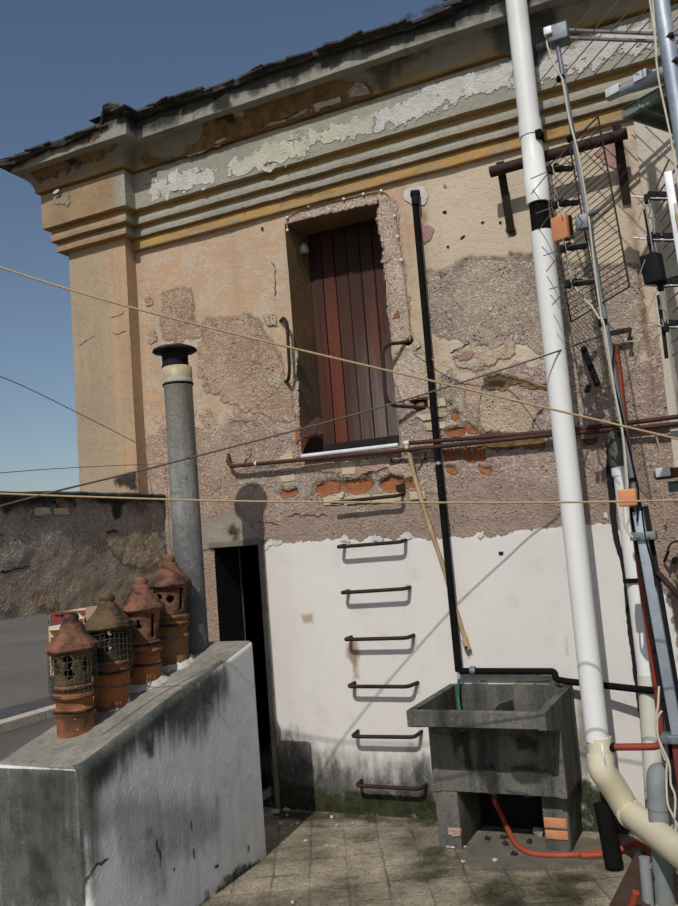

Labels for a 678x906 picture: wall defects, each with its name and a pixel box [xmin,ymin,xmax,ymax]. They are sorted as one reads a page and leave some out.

peeling [148,60,515,203]
spalling [144,193,547,501]
spalling [556,256,647,391]
peeling [263,539,282,571]
water stain [24,675,222,898]
water stain [270,737,437,820]
water stain [432,727,558,797]